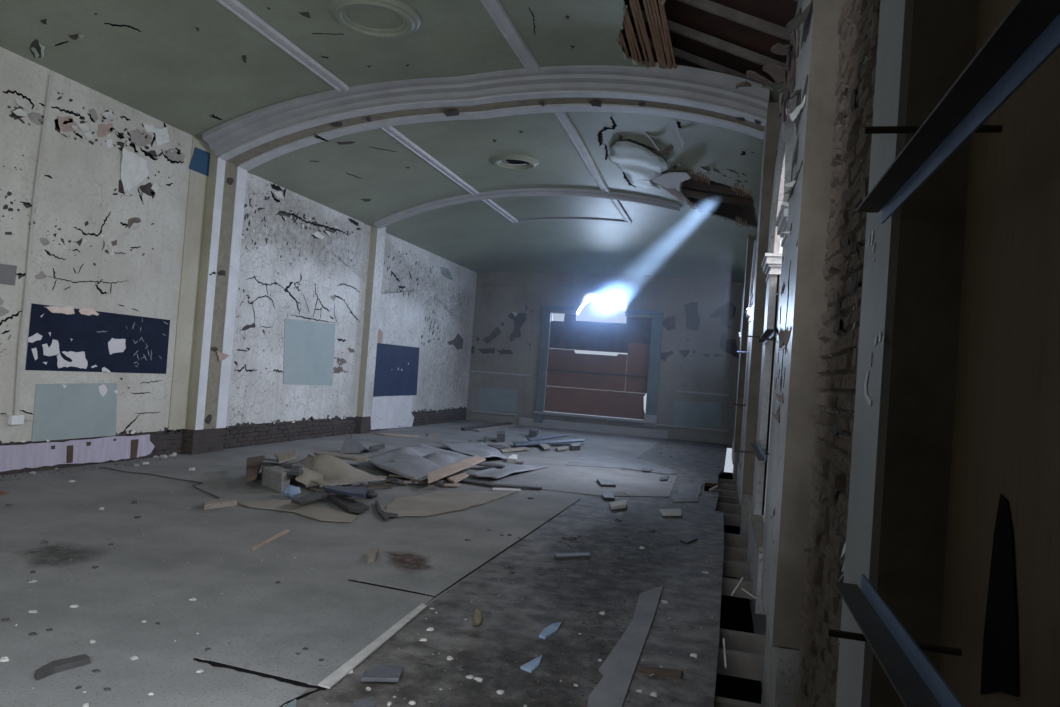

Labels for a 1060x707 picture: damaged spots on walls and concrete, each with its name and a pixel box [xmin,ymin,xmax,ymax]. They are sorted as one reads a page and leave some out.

peeling [30,34,87,58]
peeling [778,0,813,209]
peeling [2,89,185,202]
flaking render [652,121,691,202]
peeling [1,187,164,266]
crack [49,264,138,311]
crack [242,274,360,324]
peeling [660,301,738,361]
peeling [774,283,792,354]
crack [348,499,580,599]
crack [193,658,326,707]